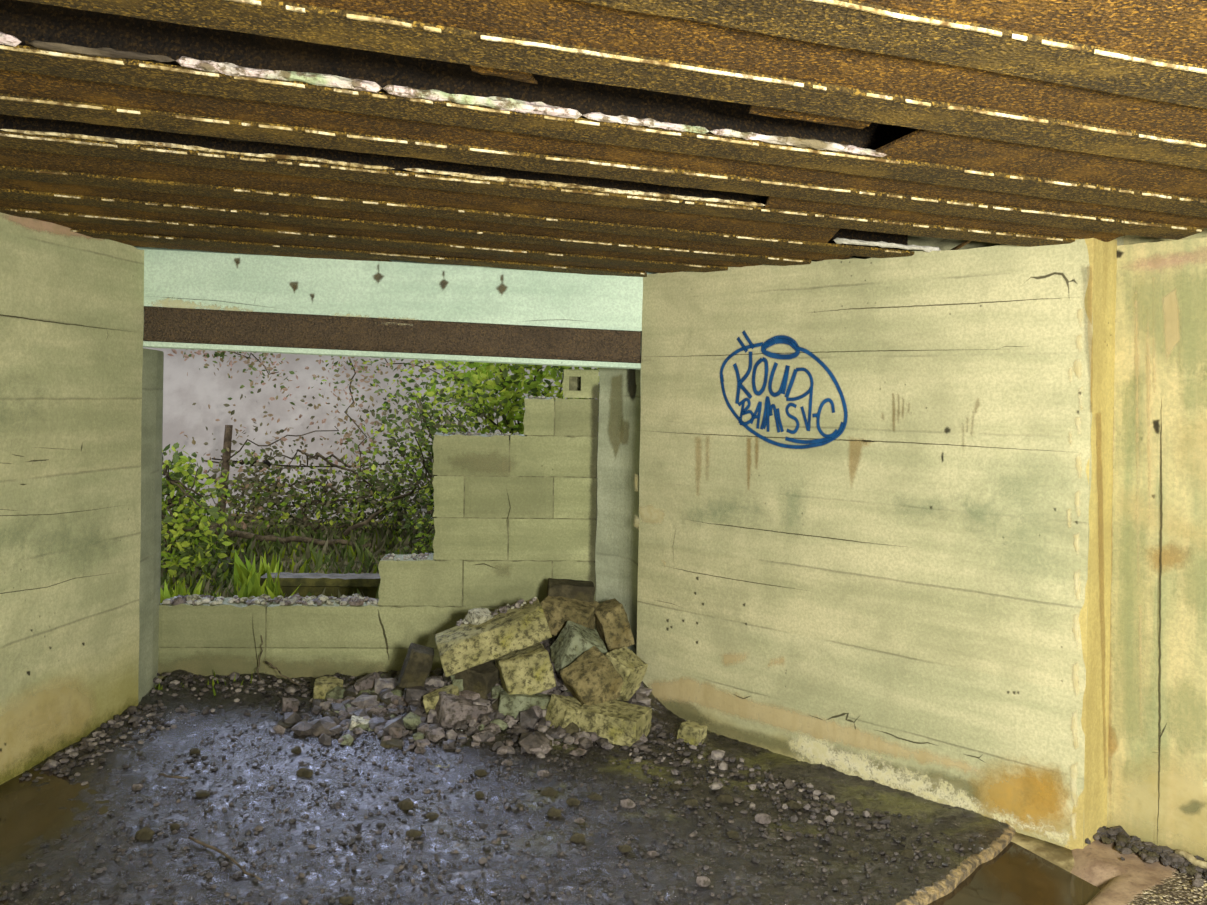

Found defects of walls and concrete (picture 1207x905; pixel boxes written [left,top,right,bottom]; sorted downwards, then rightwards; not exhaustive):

corrosion [277,0,1207,142]
corrosion [0,69,1207,294]
damp [0,687,91,769]
damp [657,698,1069,844]